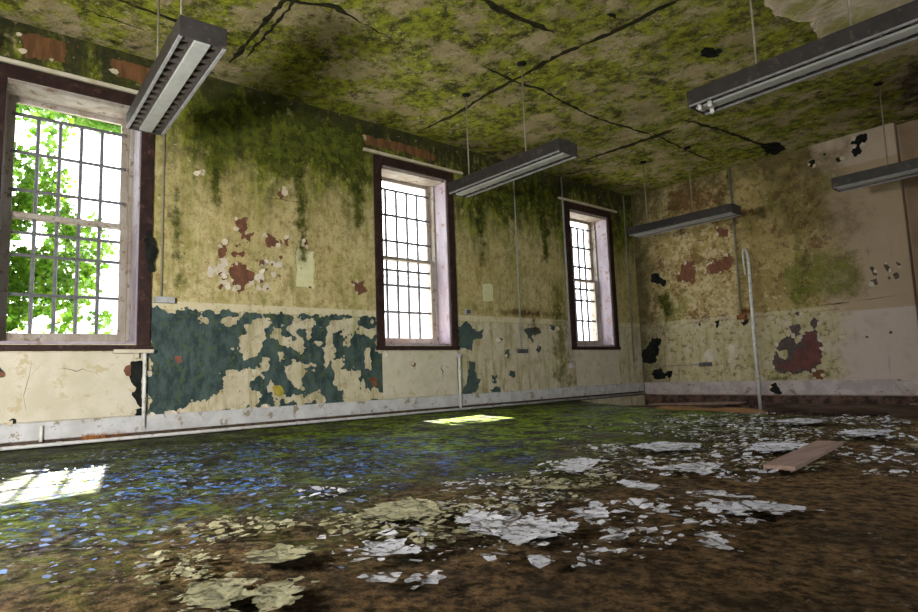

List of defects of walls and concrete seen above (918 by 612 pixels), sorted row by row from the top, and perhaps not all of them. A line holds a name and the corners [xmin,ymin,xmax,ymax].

peeling [764,0,914,38]
leakage [701,47,723,58]
crack [419,0,774,163]
leakage [759,142,786,156]
leakage [211,153,222,206]
peeling [207,217,290,294]
flaking render [677,253,733,285]
peeling [123,305,388,419]
peeling [458,321,515,394]
peeling [524,325,560,353]
flaking render [767,312,825,395]